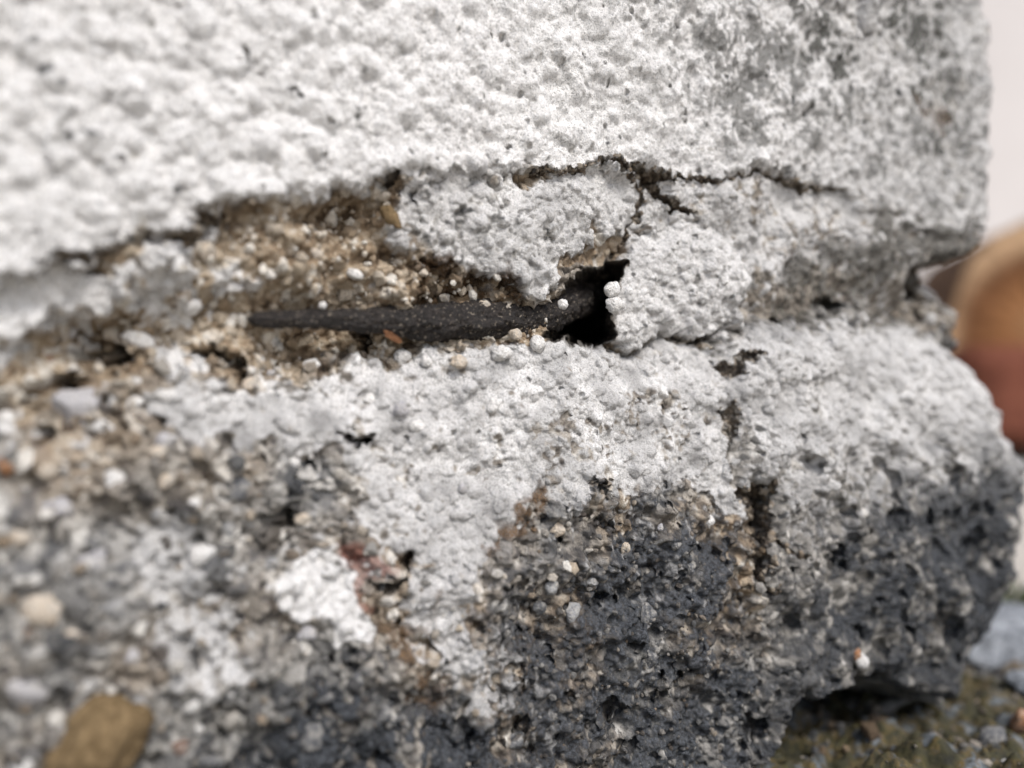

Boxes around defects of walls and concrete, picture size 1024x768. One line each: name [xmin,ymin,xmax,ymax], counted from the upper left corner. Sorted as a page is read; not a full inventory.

crack [530,153,846,260]
peeling [385,169,656,308]
spalling [0,303,779,768]
spalling [826,542,850,573]
spalling [885,501,909,534]
spalling [931,601,963,650]
spalling [854,648,870,670]